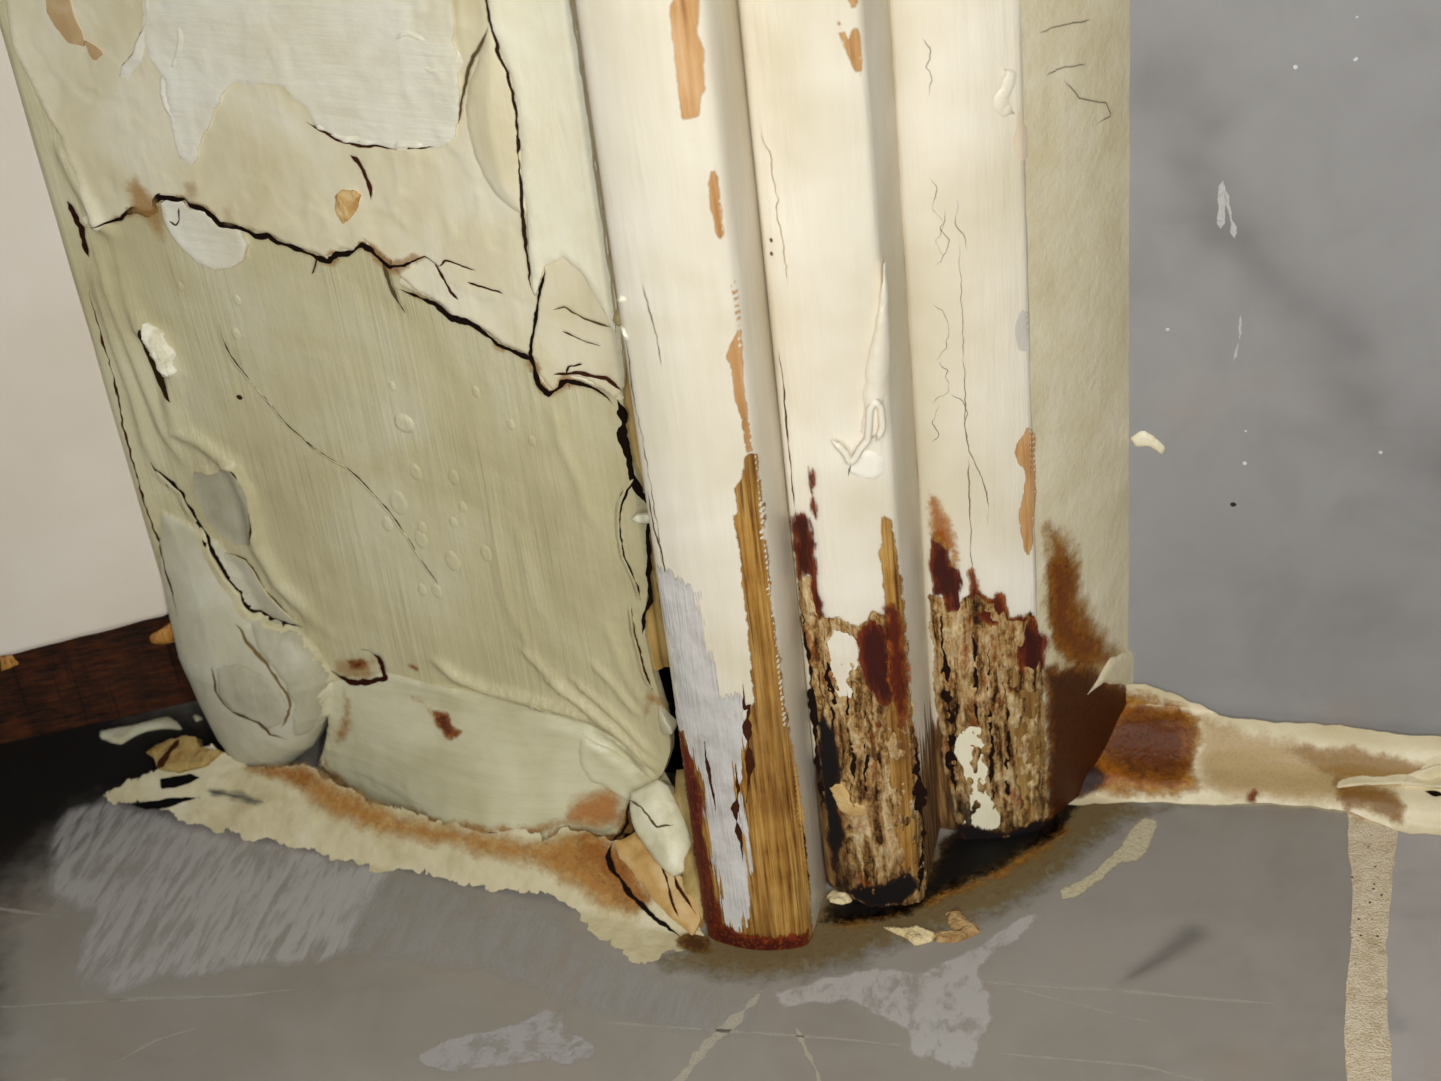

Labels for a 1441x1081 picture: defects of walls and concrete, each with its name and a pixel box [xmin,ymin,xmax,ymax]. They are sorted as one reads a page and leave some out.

peeling [306,122,431,150]
crack [67,0,665,691]
corrosion [789,469,824,619]
corrosion [856,603,912,729]
corrosion [929,497,1200,819]
corrosion [249,765,650,914]
peeling [630,667,812,953]
leakage [659,802,1148,980]